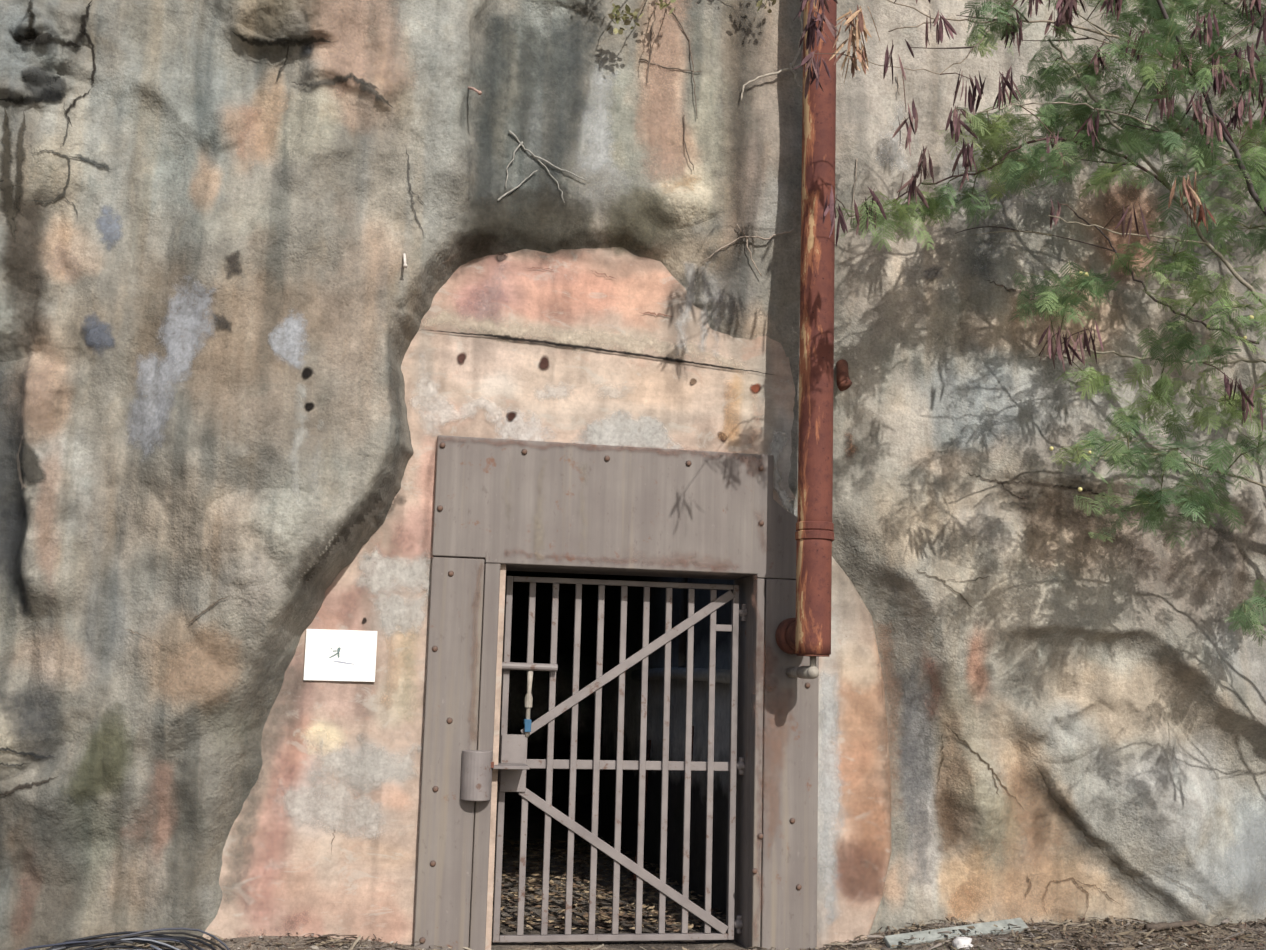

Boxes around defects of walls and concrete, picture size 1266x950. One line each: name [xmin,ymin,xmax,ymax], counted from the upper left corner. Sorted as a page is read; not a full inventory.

crack [232,31,393,108]
crack [0,0,112,242]
damp [472,19,624,260]
damp [9,196,42,336]
crack [431,330,773,375]
crack [966,473,1129,503]
crack [0,747,56,796]
crack [937,726,1025,811]
crack [1025,876,1119,918]